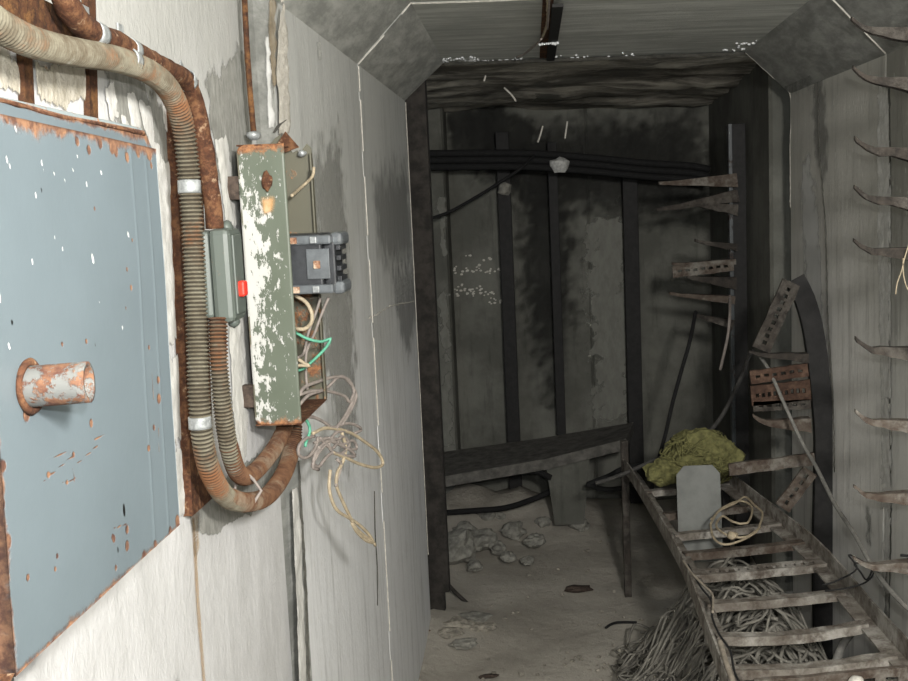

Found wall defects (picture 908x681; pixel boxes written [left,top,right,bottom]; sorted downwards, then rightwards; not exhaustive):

peeling [0,46,20,94]
peeling [35,62,86,111]
peeling [205,43,252,227]
spalling [265,0,291,134]
damp [448,105,547,151]
peeling [105,71,252,535]
peeling [229,317,258,467]
peeling [226,456,280,492]